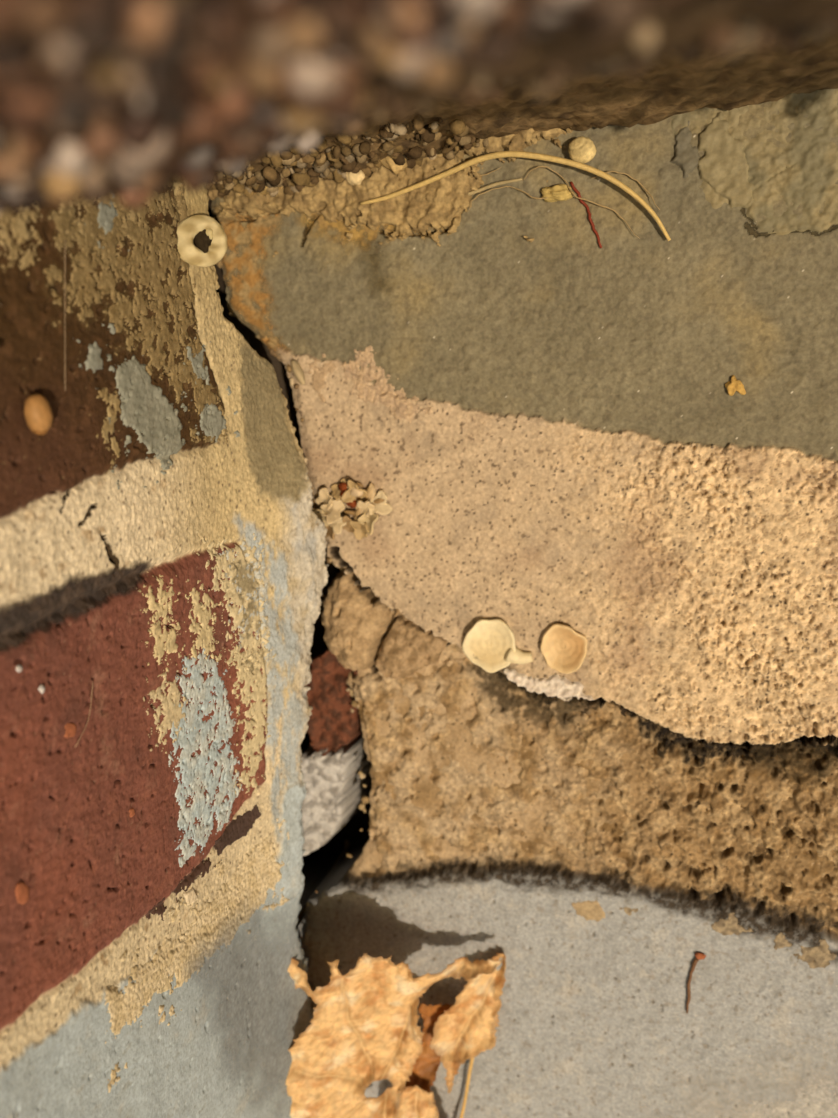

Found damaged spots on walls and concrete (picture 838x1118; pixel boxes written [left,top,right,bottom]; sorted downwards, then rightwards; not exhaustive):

crack [301,218,317,247]
crack [379,229,449,238]
peeling [0,181,240,490]
crack [269,348,304,422]
crack [60,490,119,570]
crack [326,546,371,592]
crack [581,697,631,726]
crack [796,735,835,755]
peeling [105,530,290,1043]
crack [296,687,372,928]
spalling [300,609,838,969]
peeling [107,1062,128,1093]